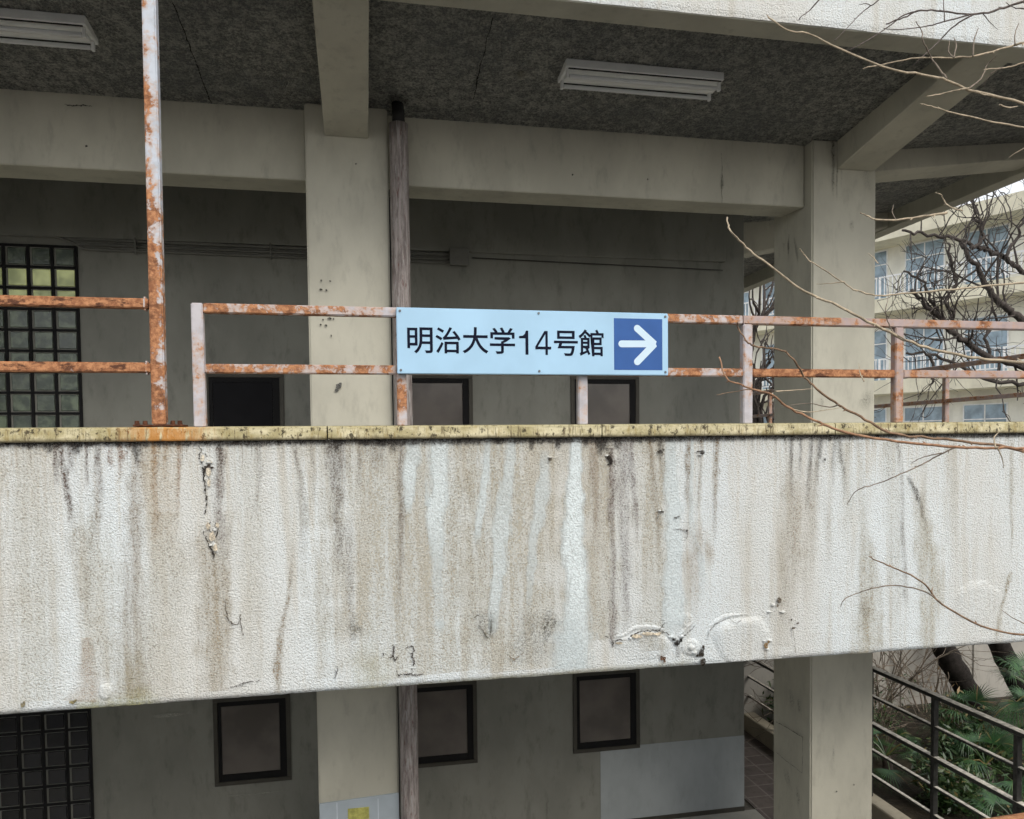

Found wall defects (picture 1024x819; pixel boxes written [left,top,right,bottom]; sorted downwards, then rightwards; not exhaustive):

crack [172,3,212,103]
spalling [200,455,214,487]
water stain [0,433,1024,684]
crack [605,606,796,653]